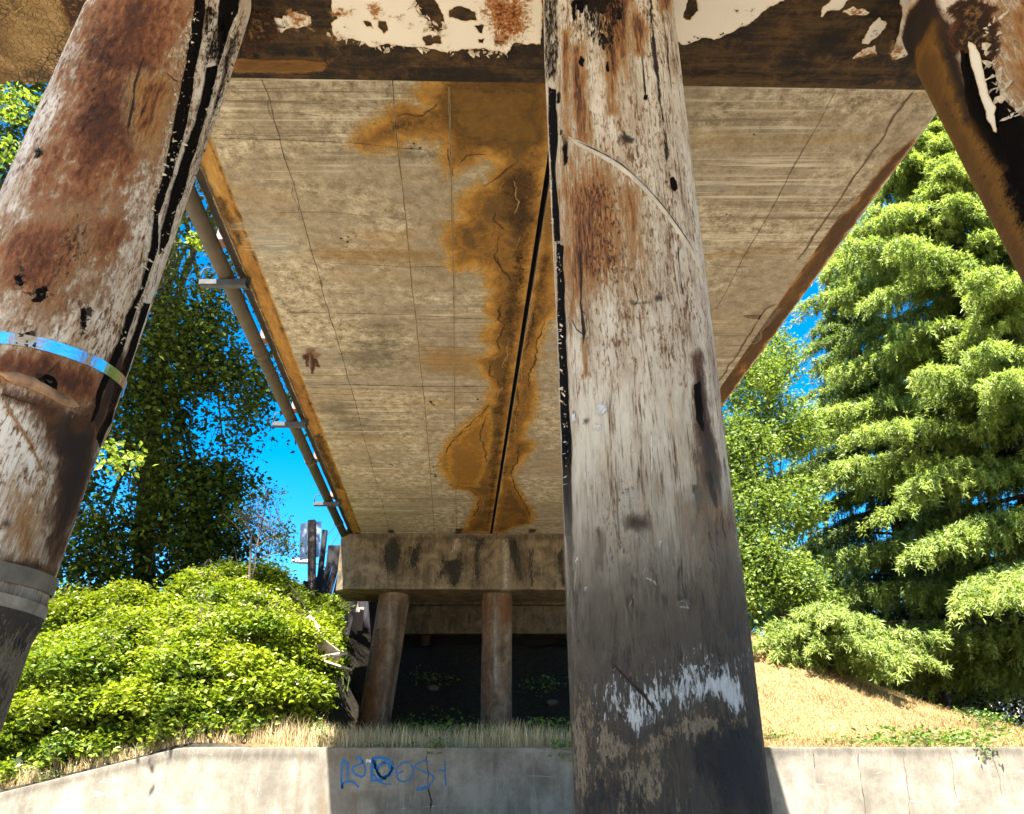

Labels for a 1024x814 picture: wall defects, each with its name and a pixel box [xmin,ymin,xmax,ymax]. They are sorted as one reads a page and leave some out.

peeling [274,10,313,33]
peeling [571,0,628,72]
peeling [672,0,784,49]
peeling [945,10,1024,239]
corrosion [0,0,333,577]
water stain [196,81,565,588]
corrosion [544,0,773,814]